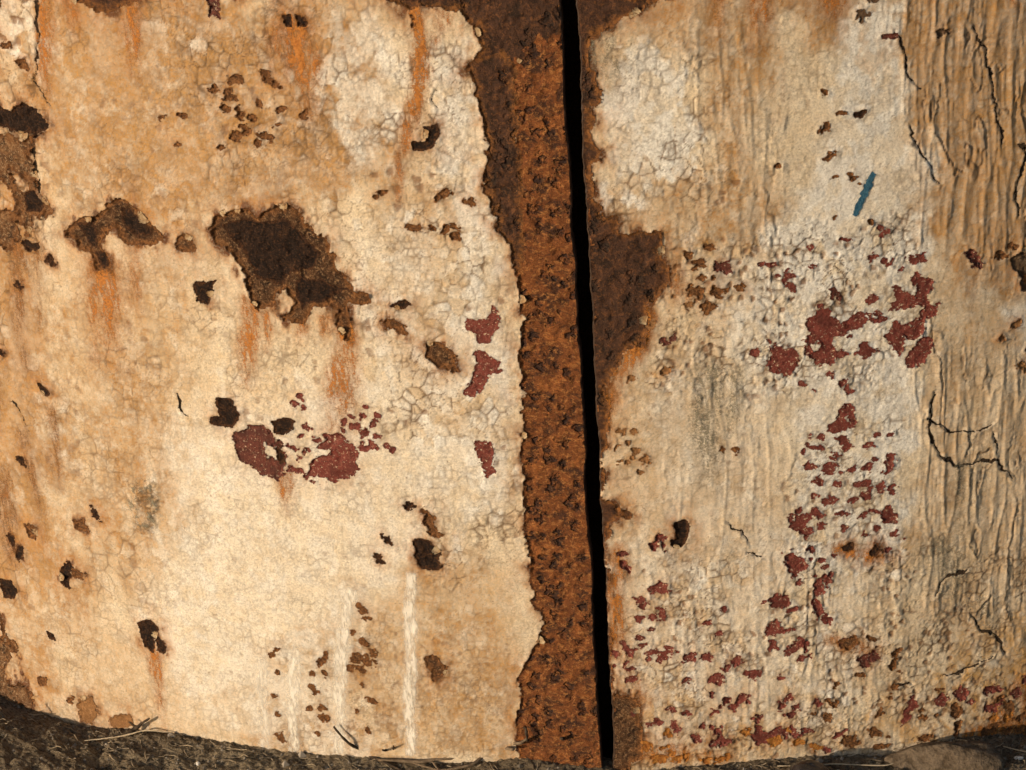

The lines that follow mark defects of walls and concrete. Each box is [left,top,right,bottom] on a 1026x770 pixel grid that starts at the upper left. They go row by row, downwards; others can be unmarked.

rust [70,0,141,57]
rust [272,15,320,93]
crack [899,35,921,89]
crack [910,126,940,184]
crack [972,26,1026,216]
peeling [207,203,371,341]
rust [326,323,357,414]
rust [389,0,688,770]
peeling [209,393,396,484]
peeling [749,251,941,663]
crack [927,392,1013,479]
peeling [611,580,903,765]